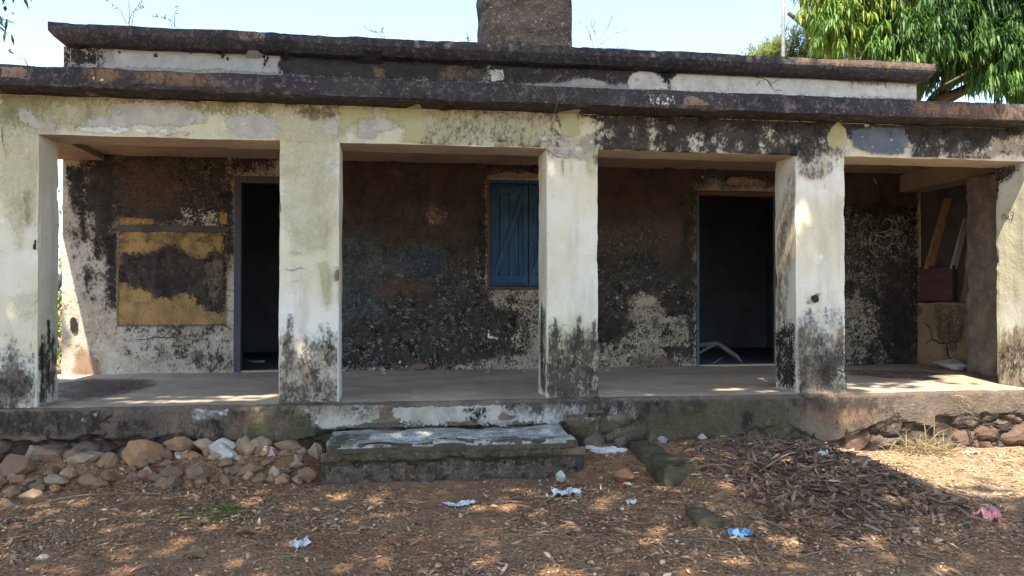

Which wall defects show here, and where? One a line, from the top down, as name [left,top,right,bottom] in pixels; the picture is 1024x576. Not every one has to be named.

peeling [18,107,56,132]
peeling [76,100,281,139]
leakage [0,319,104,437]
leakage [63,154,280,312]
peeling [116,208,228,325]
leakage [121,324,233,373]
leakage [227,161,697,457]
leakage [577,114,1024,433]
crack [924,323,959,359]